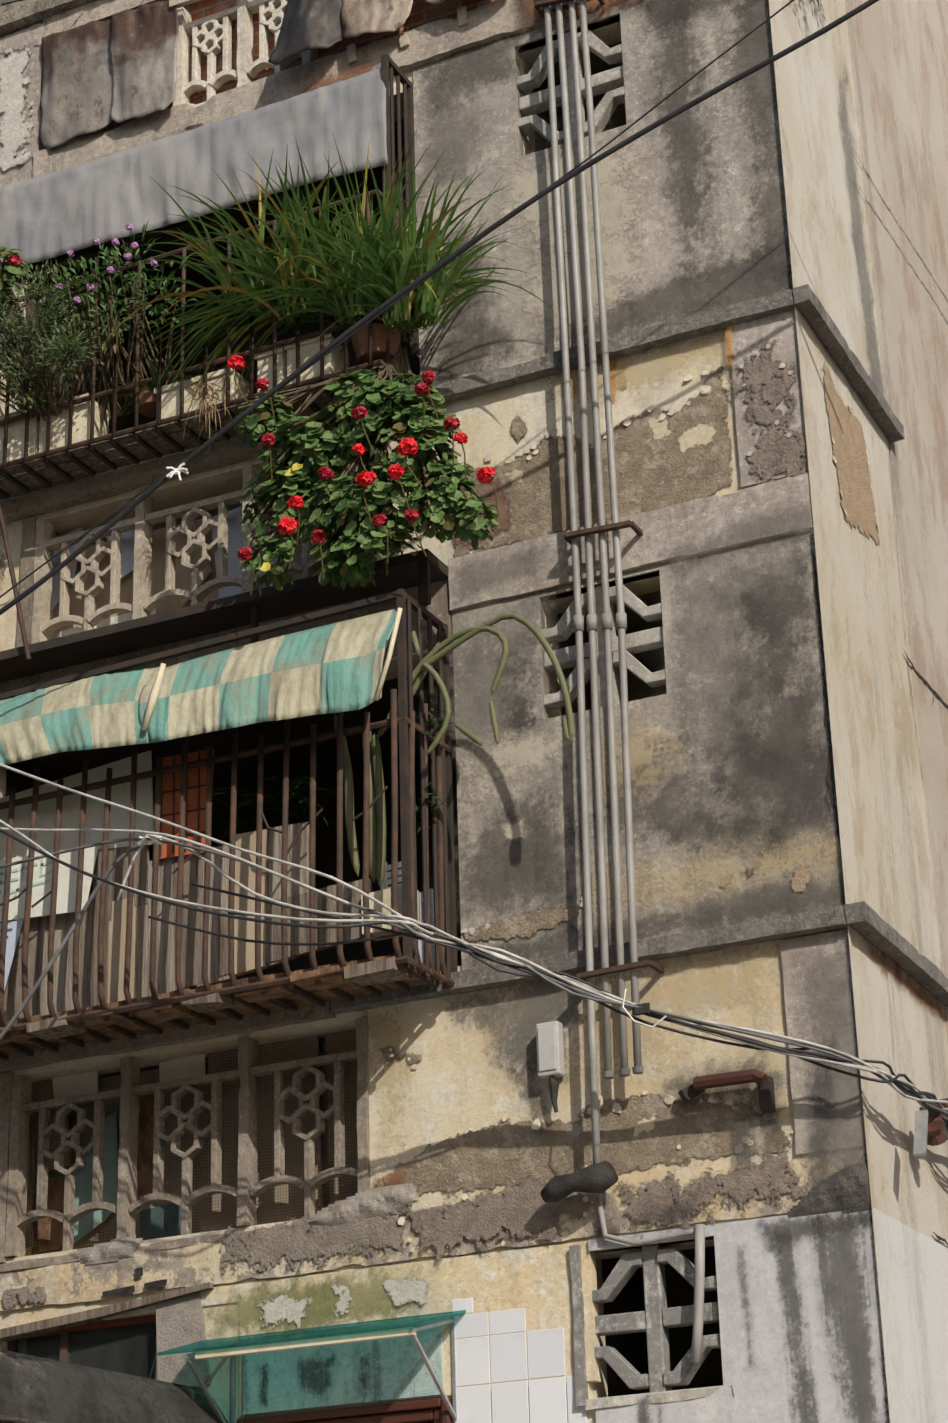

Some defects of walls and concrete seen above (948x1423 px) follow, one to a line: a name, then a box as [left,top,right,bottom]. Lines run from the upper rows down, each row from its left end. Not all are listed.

peeling [0,43,35,177]
leakage [421,0,793,384]
peeling [453,339,808,558]
peeling [822,359,880,545]
leakage [435,592,579,780]
leakage [601,505,837,868]
leakage [454,792,580,917]
leakage [470,878,846,967]
leakage [448,974,585,1134]
peeling [219,1090,811,1276]
peeling [2,1286,47,1312]
leakage [759,1210,890,1423]